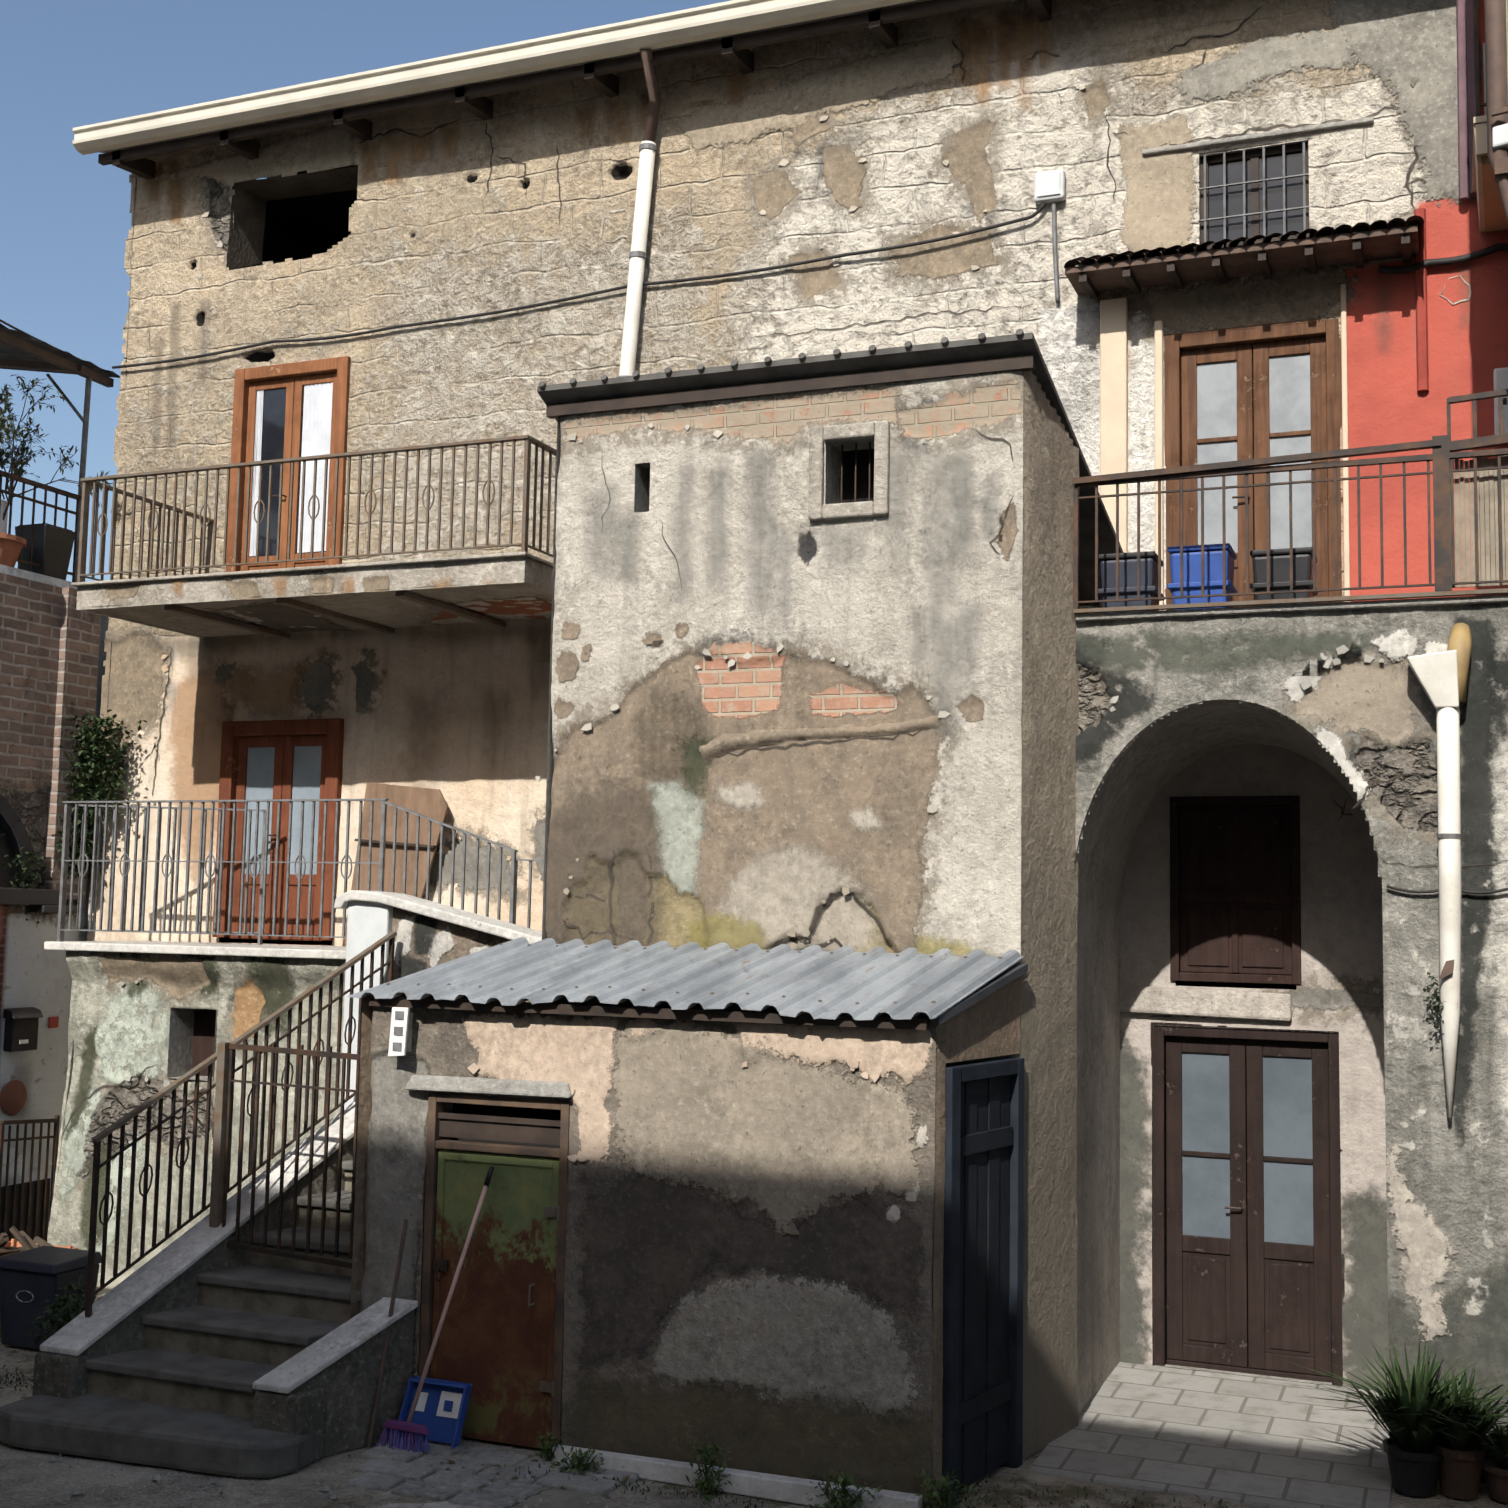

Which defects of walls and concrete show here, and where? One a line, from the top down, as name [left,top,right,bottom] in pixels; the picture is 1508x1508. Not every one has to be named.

crack [1163,6,1262,70]
crack [359,118,562,226]
flaking render [746,106,872,224]
flaking render [878,112,1013,292]
crack [1105,106,1426,207]
flaking render [783,238,847,305]
spalling [207,569,357,632]
damp [1075,630,1370,763]
flaking render [425,621,985,953]
damp [66,1027,97,1139]
damp [80,1144,107,1249]
flaking render [1386,1144,1462,1343]